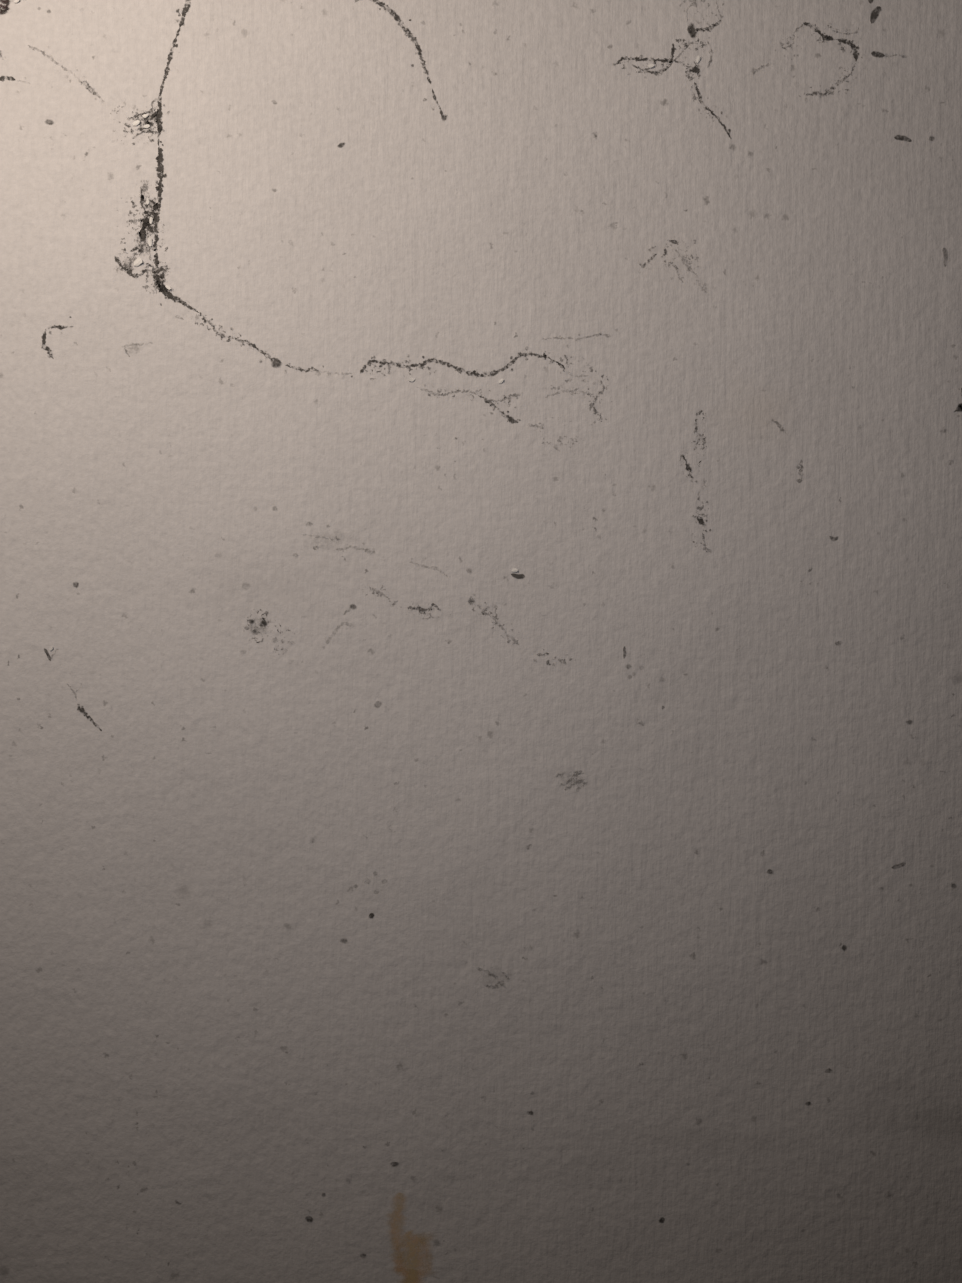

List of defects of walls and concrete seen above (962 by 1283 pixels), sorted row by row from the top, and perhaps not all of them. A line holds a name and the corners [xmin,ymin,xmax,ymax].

crack [373,0,446,120]
crack [617,20,731,138]
crack [804,22,859,95]
crack [86,0,316,372]
crack [351,353,568,423]